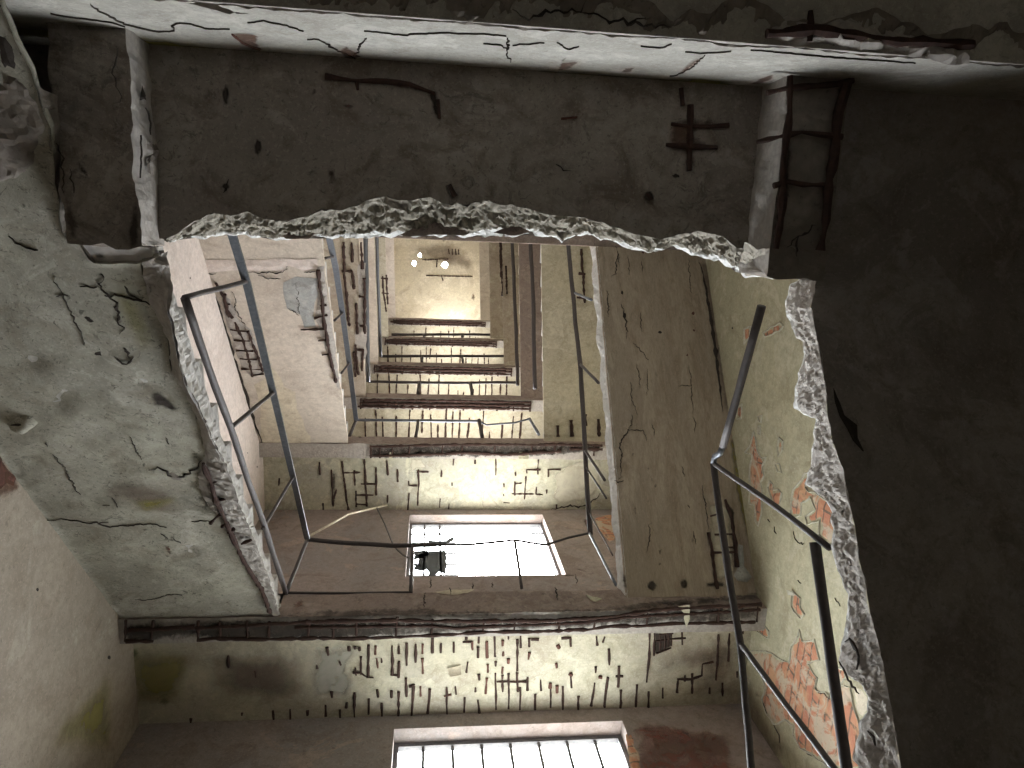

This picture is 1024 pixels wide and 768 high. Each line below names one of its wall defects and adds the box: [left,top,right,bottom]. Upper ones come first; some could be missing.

crack [50,1,916,178]
crack [53,274,150,346]
spalling [124,73,901,768]
crack [833,388,864,451]
crack [45,437,209,543]
crack [682,467,709,543]